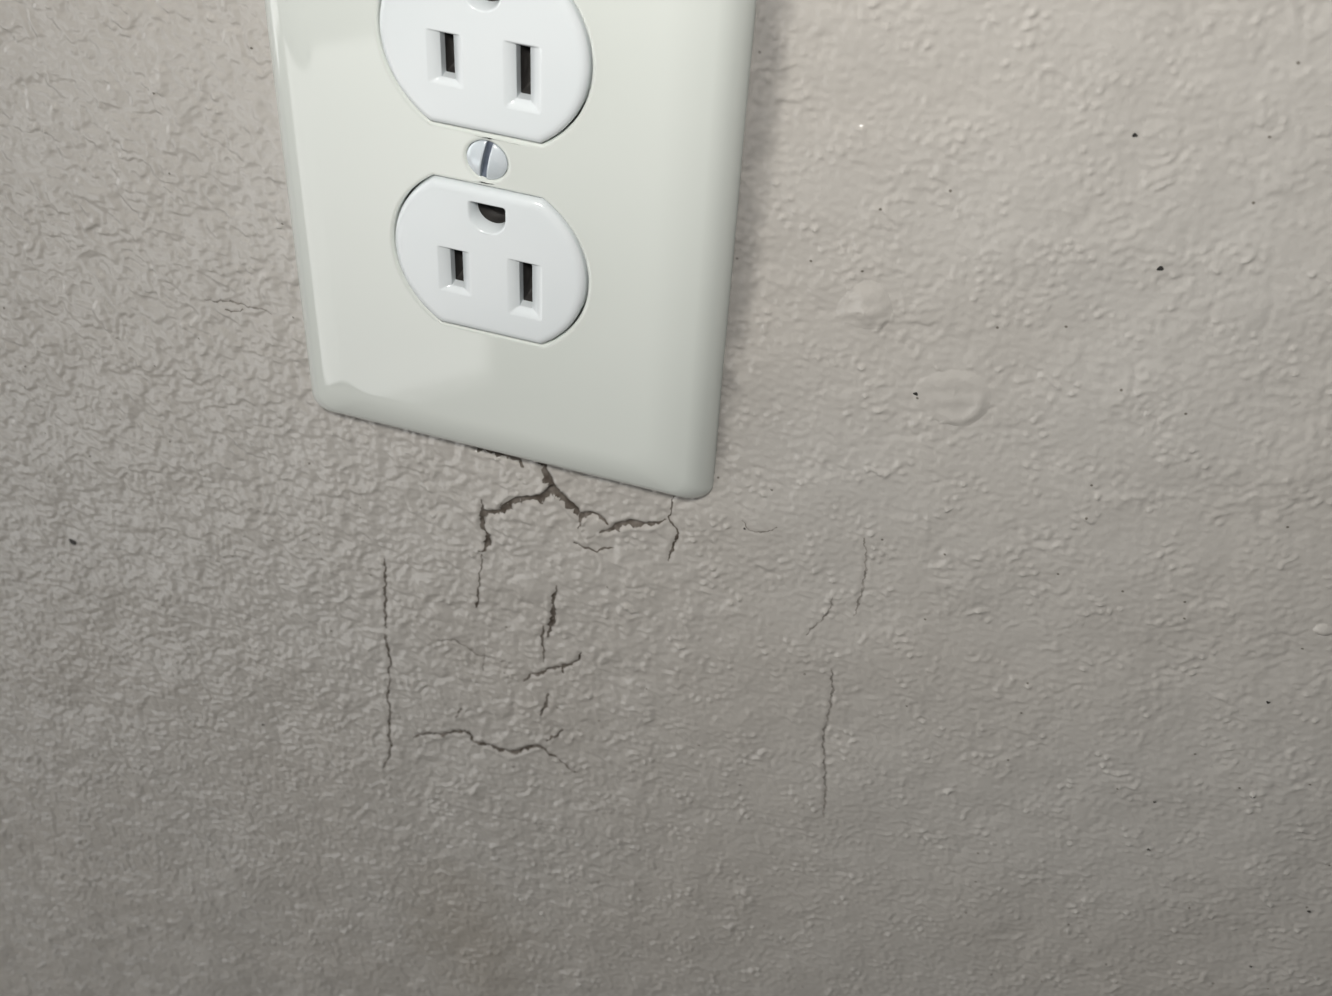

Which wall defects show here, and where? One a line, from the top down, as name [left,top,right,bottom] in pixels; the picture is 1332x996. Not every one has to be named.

crack [475,447,679,608]
crack [383,558,582,772]